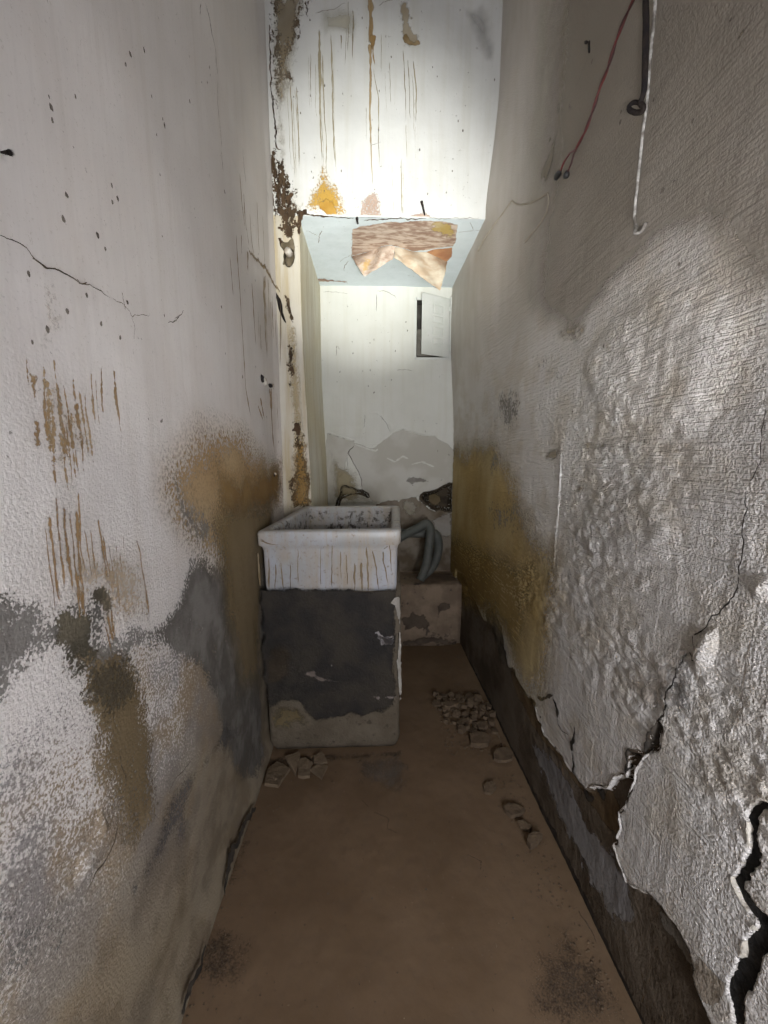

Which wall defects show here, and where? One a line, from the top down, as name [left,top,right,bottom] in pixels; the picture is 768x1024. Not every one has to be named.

corrosion [368,0,376,182]
crack [0,235,183,334]
corrosion [26,359,149,649]
peeling [326,423,454,571]
damp [450,446,554,696]
crack [624,408,767,779]
damp [55,586,195,858]
flaking render [460,593,725,1024]
crack [730,801,768,1024]